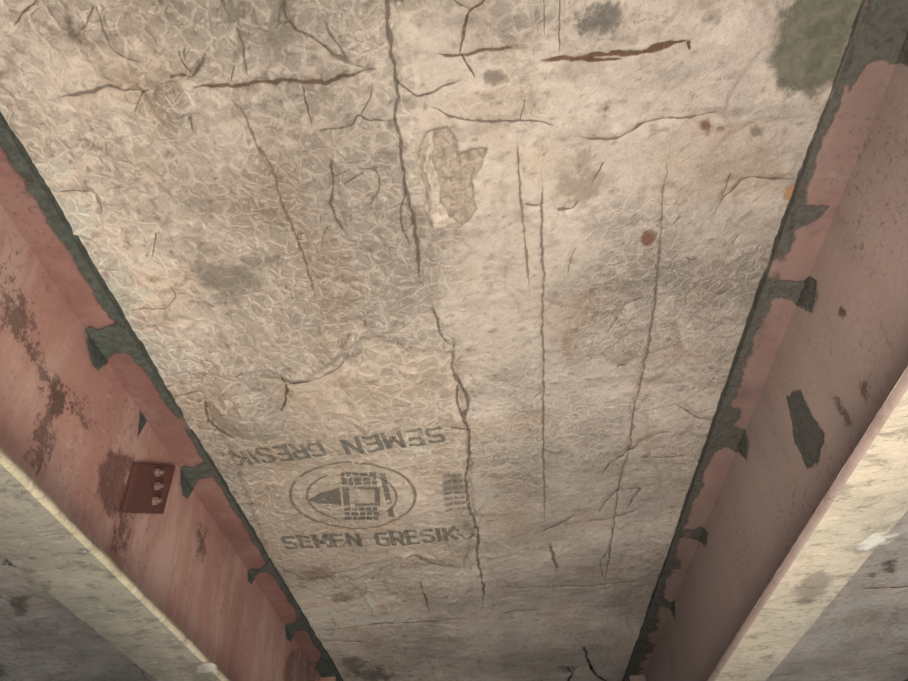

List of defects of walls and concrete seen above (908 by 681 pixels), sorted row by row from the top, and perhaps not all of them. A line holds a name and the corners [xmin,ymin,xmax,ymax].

crack [543,0,691,62]
crack [170,0,543,288]
spalling [416,127,487,230]
water stain [770,0,871,261]
rust [1,277,96,474]
peeling [85,323,147,371]
rust [97,452,135,551]
crack [433,311,485,598]
crack [517,151,575,502]
water stain [622,272,779,681]
peeling [786,390,824,468]
water stain [859,532,897,550]